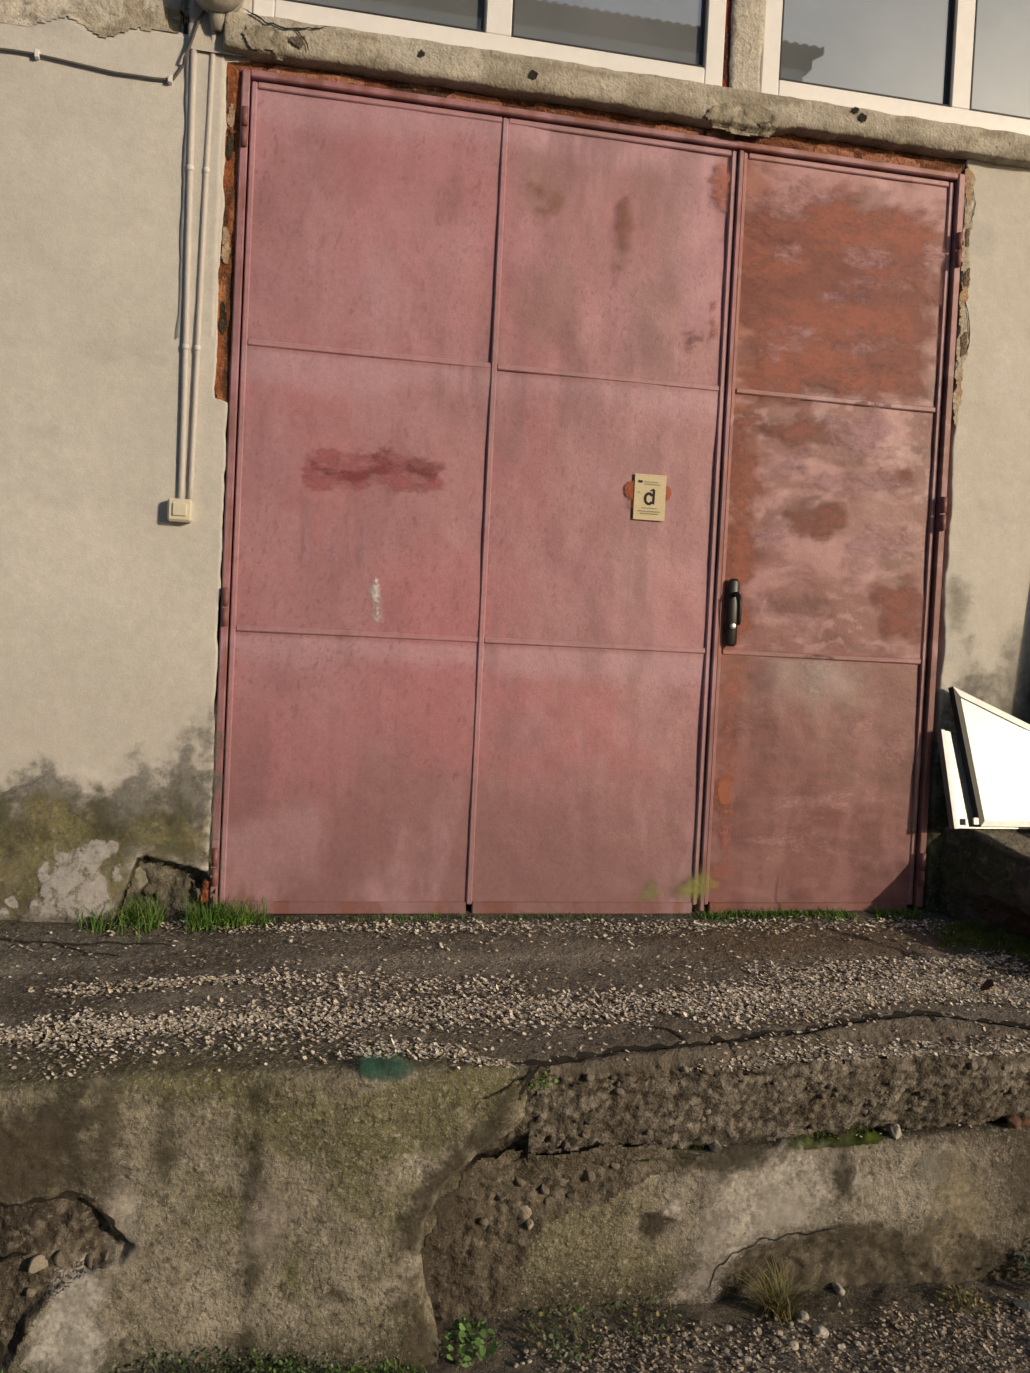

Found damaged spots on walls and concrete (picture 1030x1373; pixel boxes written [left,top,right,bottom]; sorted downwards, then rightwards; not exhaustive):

spalling [0,0,190,38]
leakage [0,716,221,861]
peeling [0,839,216,923]
crack [506,1009,1030,1100]
spalling [0,1191,130,1373]